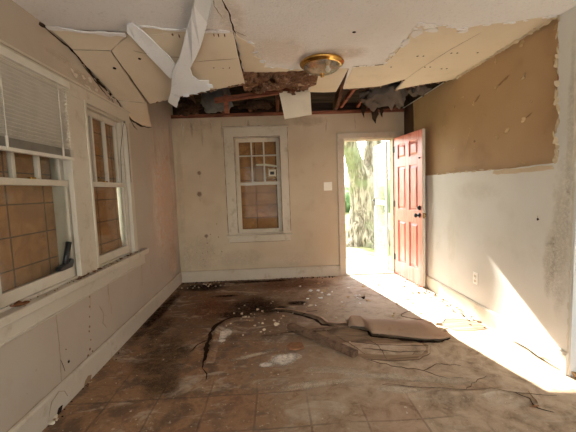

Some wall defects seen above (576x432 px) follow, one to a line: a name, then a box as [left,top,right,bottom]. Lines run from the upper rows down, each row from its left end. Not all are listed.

crack [213,0,247,37]
peeling [309,15,558,92]
damp [135,293,180,339]
damp [189,284,306,318]
damp [234,279,316,287]
damp [260,353,296,367]
crack [514,341,560,370]
crack [361,357,557,412]